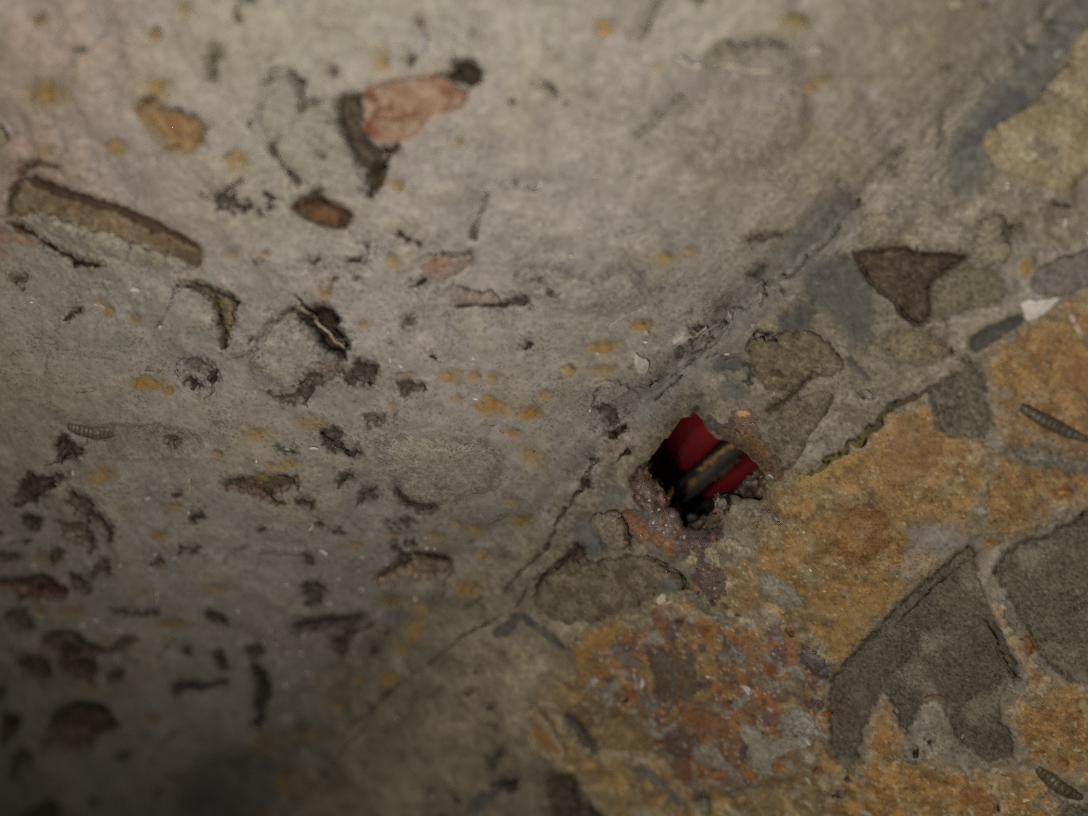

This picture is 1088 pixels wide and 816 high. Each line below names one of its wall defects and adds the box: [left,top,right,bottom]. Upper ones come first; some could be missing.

spalling [594,404,628,439]
rust [209,24,1088,816]
spalling [615,449,670,512]
crack [596,517,715,607]
crack [325,460,601,755]